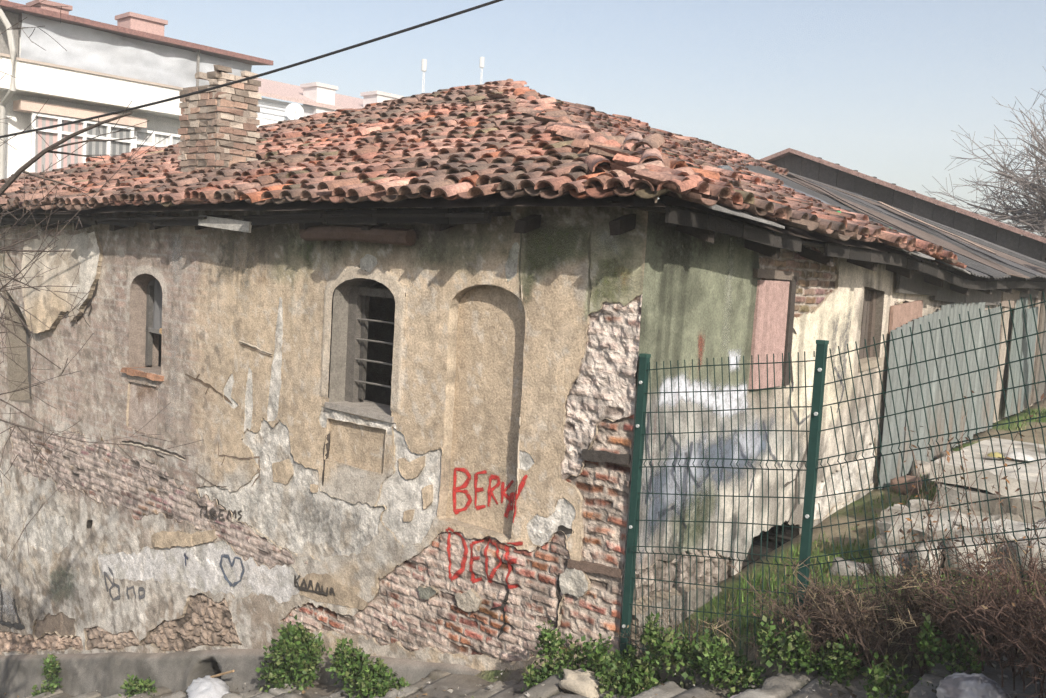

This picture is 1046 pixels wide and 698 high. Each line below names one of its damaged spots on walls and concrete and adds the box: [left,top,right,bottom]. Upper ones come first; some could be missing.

spalling [759,246,839,318]
spalling [0,294,800,664]